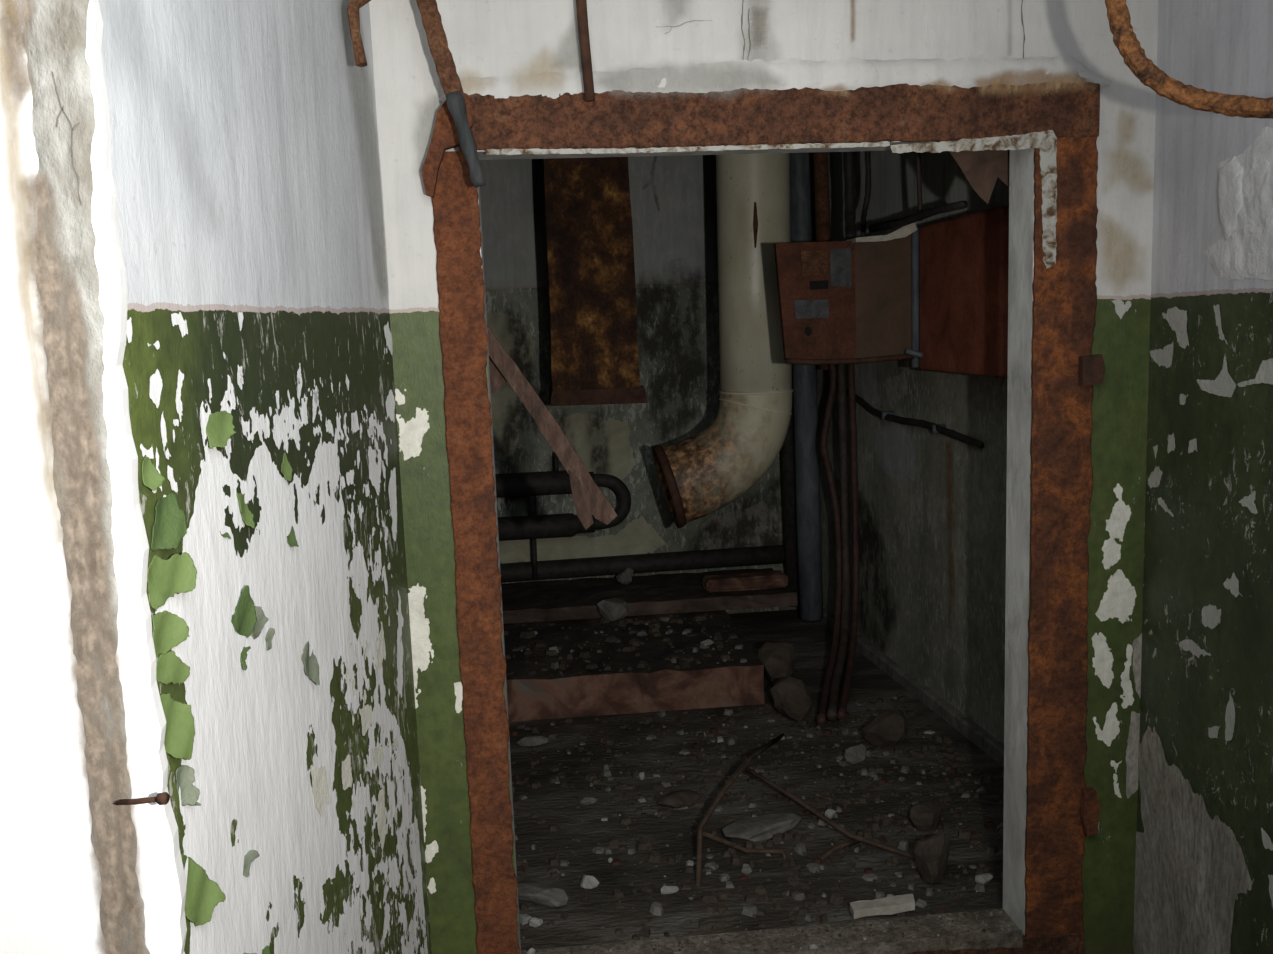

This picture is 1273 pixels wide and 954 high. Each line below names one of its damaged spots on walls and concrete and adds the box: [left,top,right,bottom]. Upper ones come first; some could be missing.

corrosion [978,72,1086,92]
peeling [171,312,188,337]
water stain [509,312,542,400]
water stain [637,265,705,439]
peeling [1149,306,1189,368]
peeling [1180,304,1273,405]
spalling [23,0,132,808]
water stain [500,397,534,466]
water stain [692,480,781,551]
peeling [140,352,438,954]
peeling [454,682,463,713]
peeling [1092,483,1273,954]